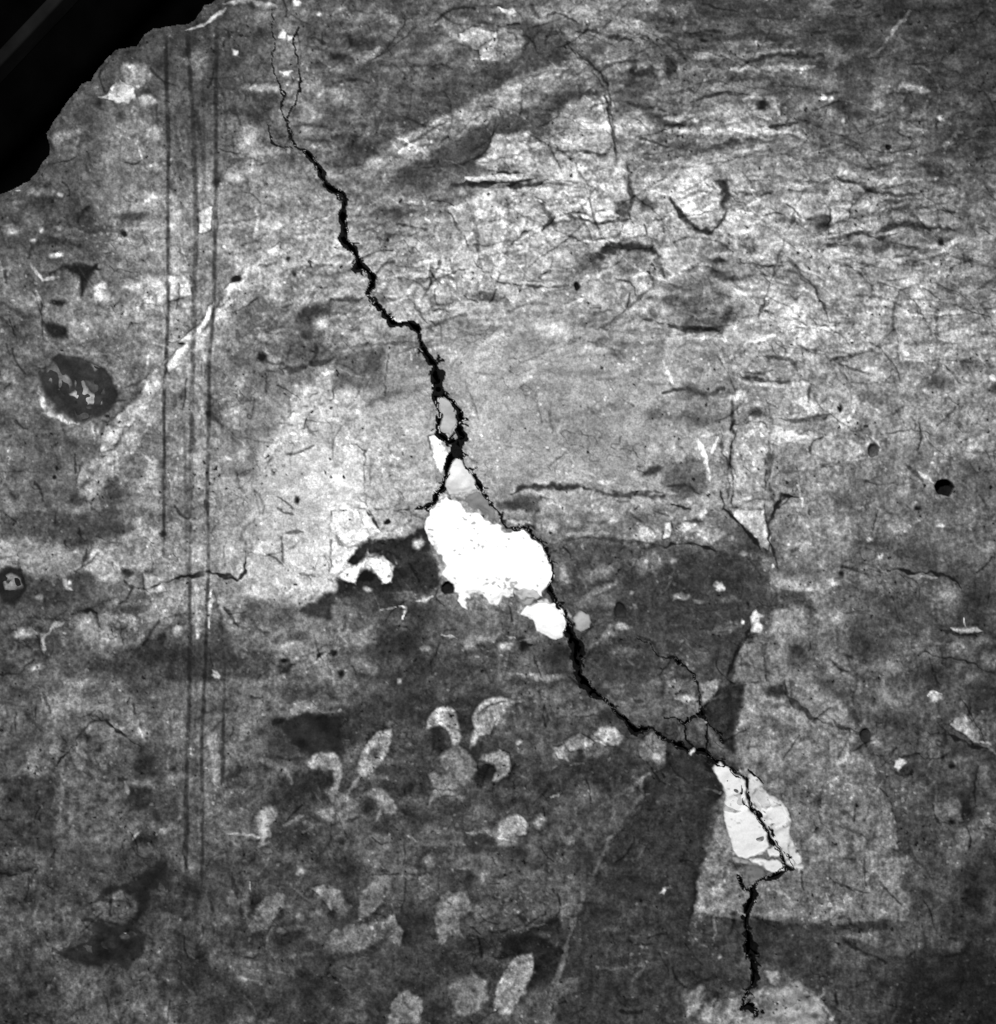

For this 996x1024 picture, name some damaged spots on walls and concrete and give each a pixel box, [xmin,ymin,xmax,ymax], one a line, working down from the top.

crack [267,9,795,1018]